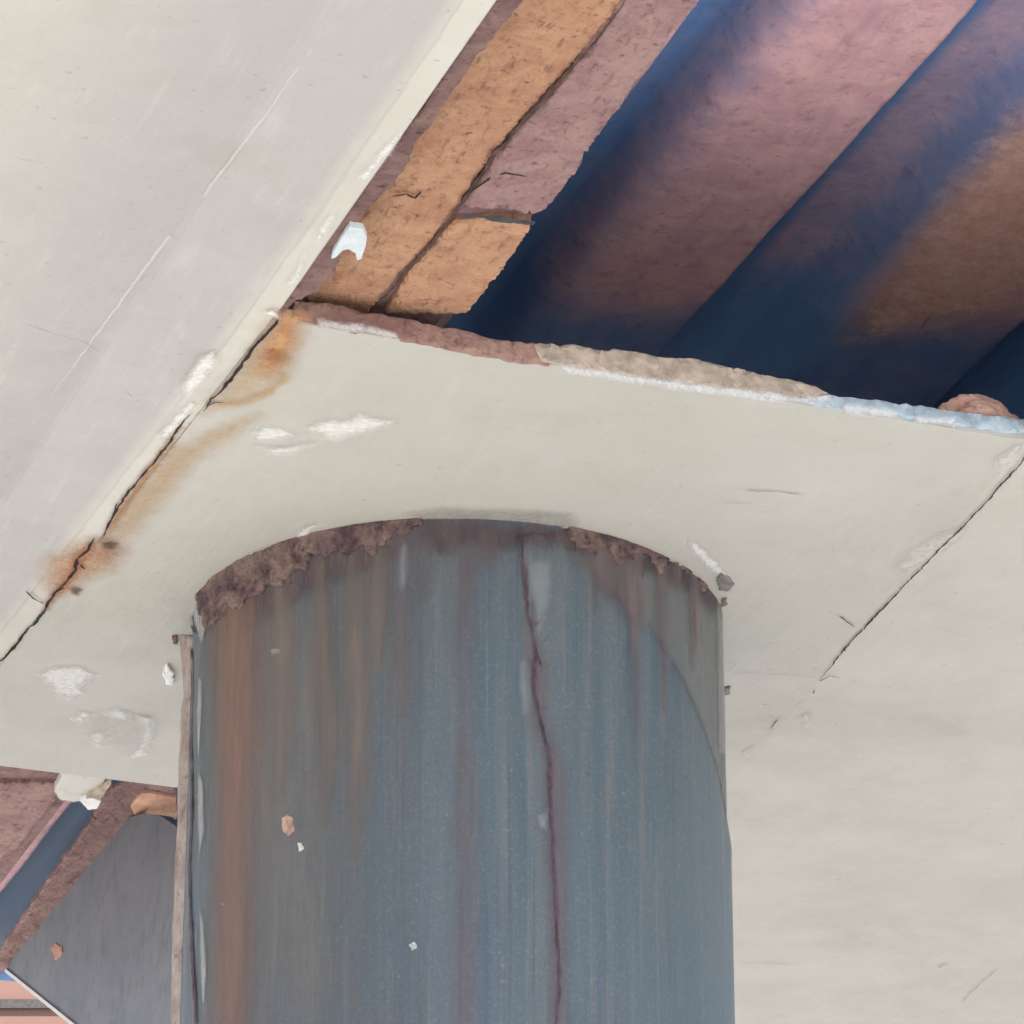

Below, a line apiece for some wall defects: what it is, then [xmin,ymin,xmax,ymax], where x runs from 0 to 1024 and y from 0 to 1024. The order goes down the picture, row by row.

peeling [360,137,397,179]
peeling [331,221,367,260]
peeling [162,354,215,437]
corrosion [230,314,299,405]
peeling [319,321,397,338]
peeling [535,343,1024,435]
crack [0,317,280,662]
corrosion [44,541,117,610]
corrosion [195,518,722,645]
crack [813,457,1024,693]
peeling [625,542,735,851]
crack [514,528,562,1024]